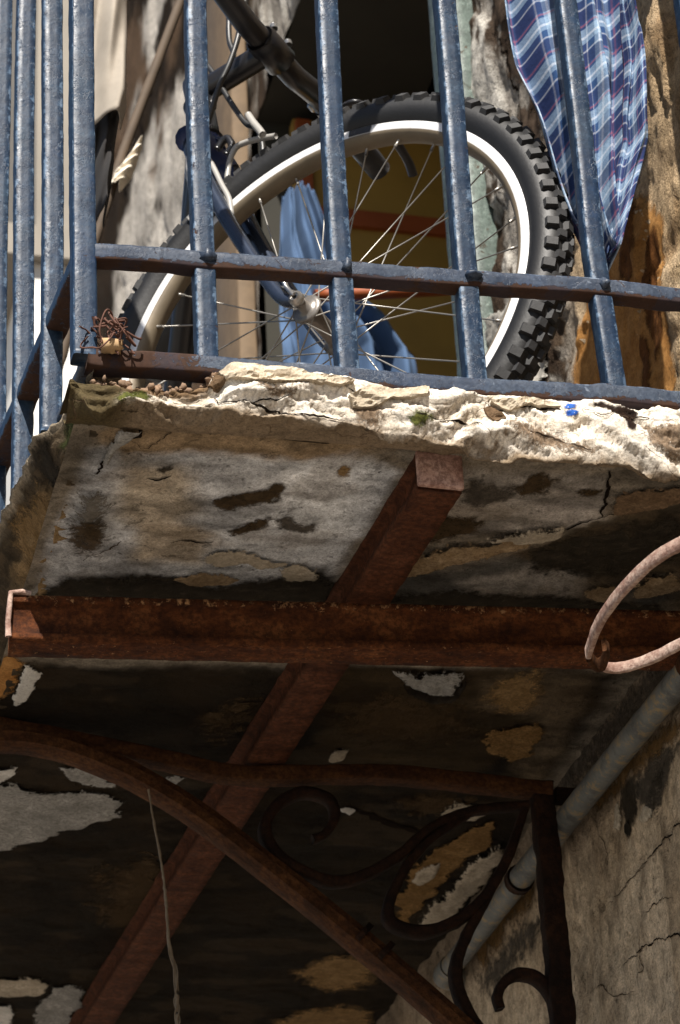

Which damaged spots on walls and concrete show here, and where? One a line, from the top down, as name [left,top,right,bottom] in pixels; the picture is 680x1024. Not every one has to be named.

crack [215,394,345,421]
peeling [208,362,430,428]
spalling [483,396,602,456]
spalling [642,420,680,463]
water stain [212,483,285,511]
water stain [227,517,315,536]
water stain [430,472,562,543]
crack [554,471,614,534]
water stain [390,589,661,611]
peeling [0,767,125,851]
crack [589,811,680,903]
crack [592,897,680,997]